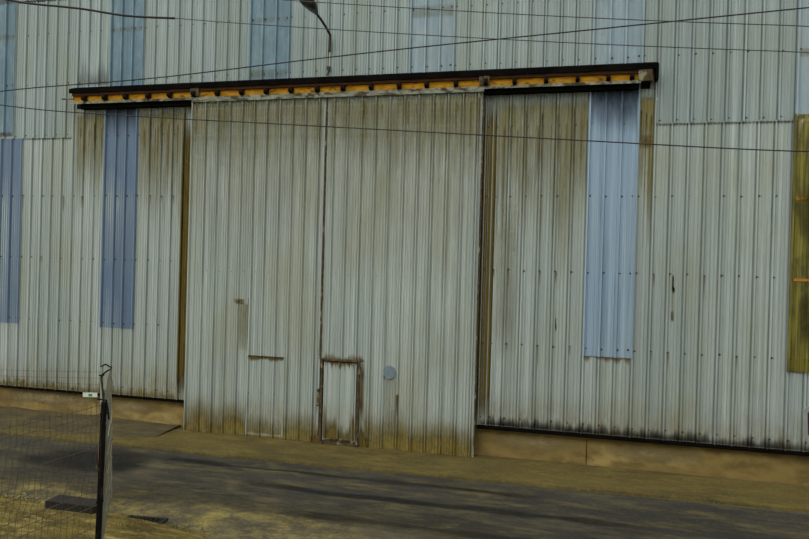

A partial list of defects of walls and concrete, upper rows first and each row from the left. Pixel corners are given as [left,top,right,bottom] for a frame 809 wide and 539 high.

rust [140,113,191,387]
rust [320,356,364,410]
rust [398,96,587,410]
rust [641,98,654,204]